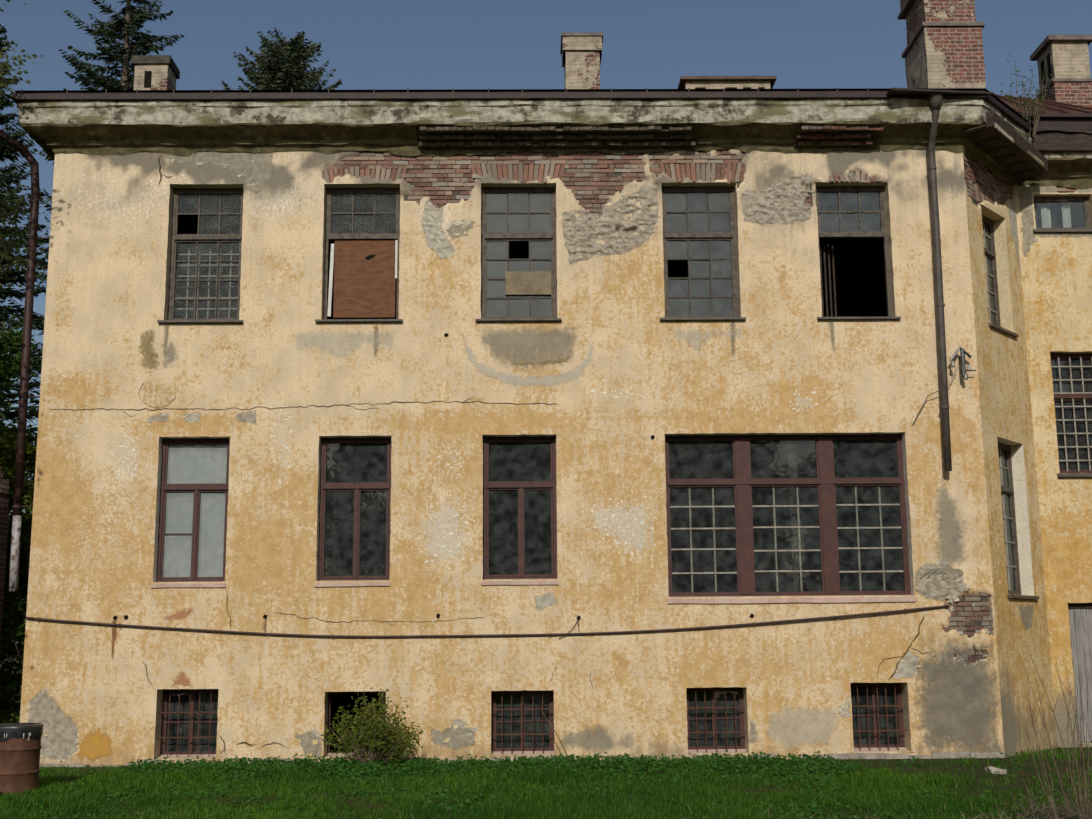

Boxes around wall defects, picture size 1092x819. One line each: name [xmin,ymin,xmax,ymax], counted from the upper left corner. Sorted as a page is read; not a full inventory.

flaking render [322,149,816,264]
flaking render [963,155,1092,271]
crack [51,398,558,416]
peeling [582,496,658,558]
crack [877,616,928,679]
flaking render [920,561,994,665]
flaking render [26,687,112,762]
flaking render [430,719,478,750]